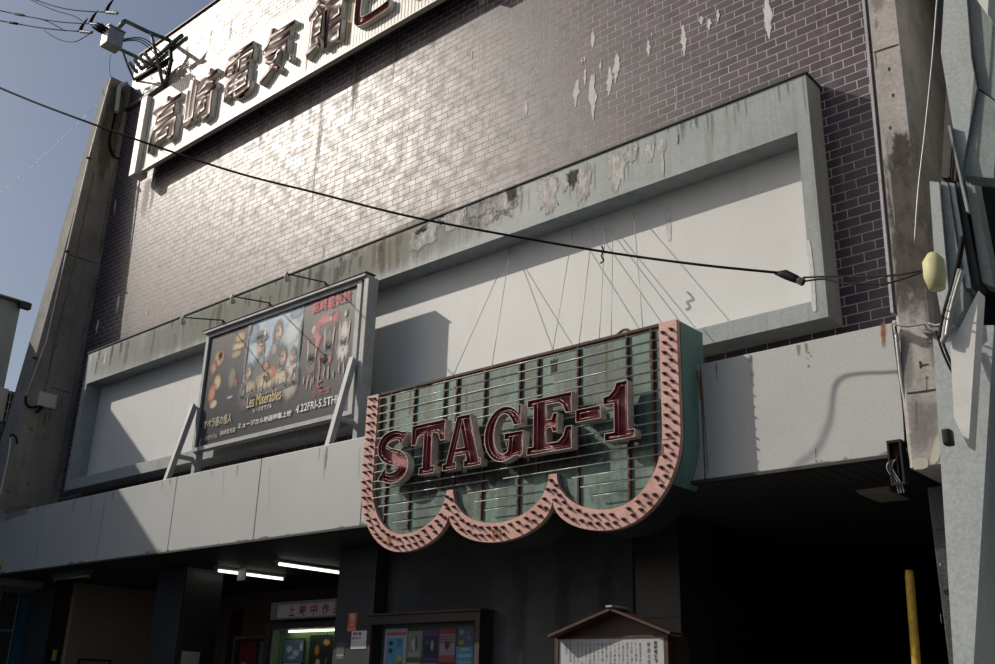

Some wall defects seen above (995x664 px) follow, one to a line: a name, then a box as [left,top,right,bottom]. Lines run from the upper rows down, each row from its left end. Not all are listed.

peeling [763,0,773,40]
peeling [572,32,620,119]
peeling [408,183,521,252]
peeling [535,160,592,216]
water stain [883,134,928,312]